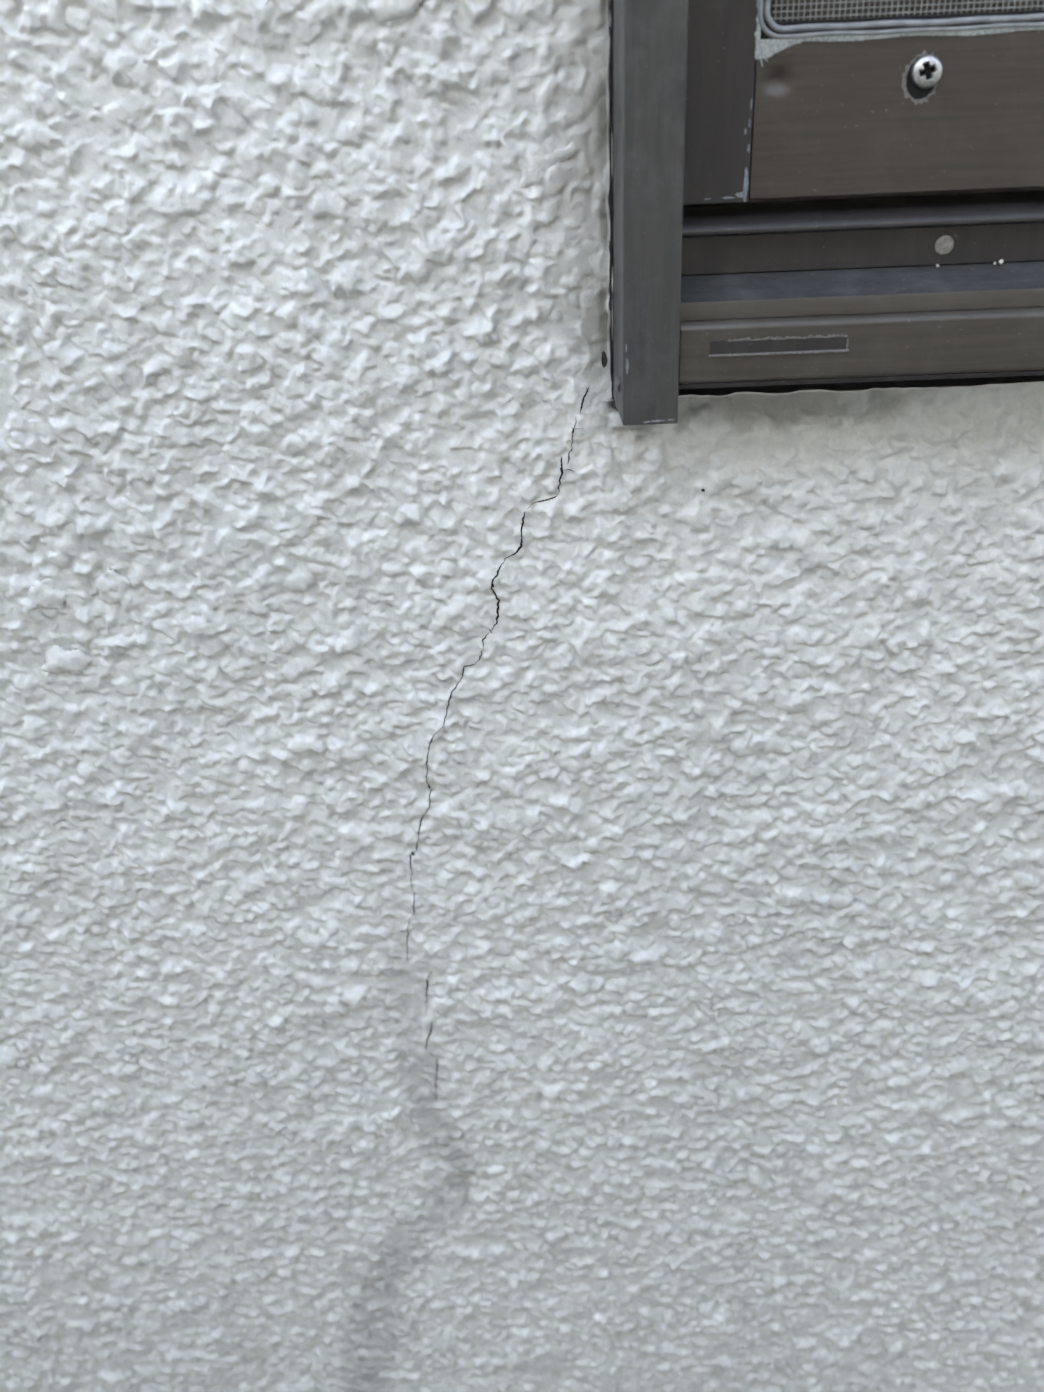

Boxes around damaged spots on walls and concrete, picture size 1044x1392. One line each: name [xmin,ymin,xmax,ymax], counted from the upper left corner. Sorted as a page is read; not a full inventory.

crack [406,0,613,1098]